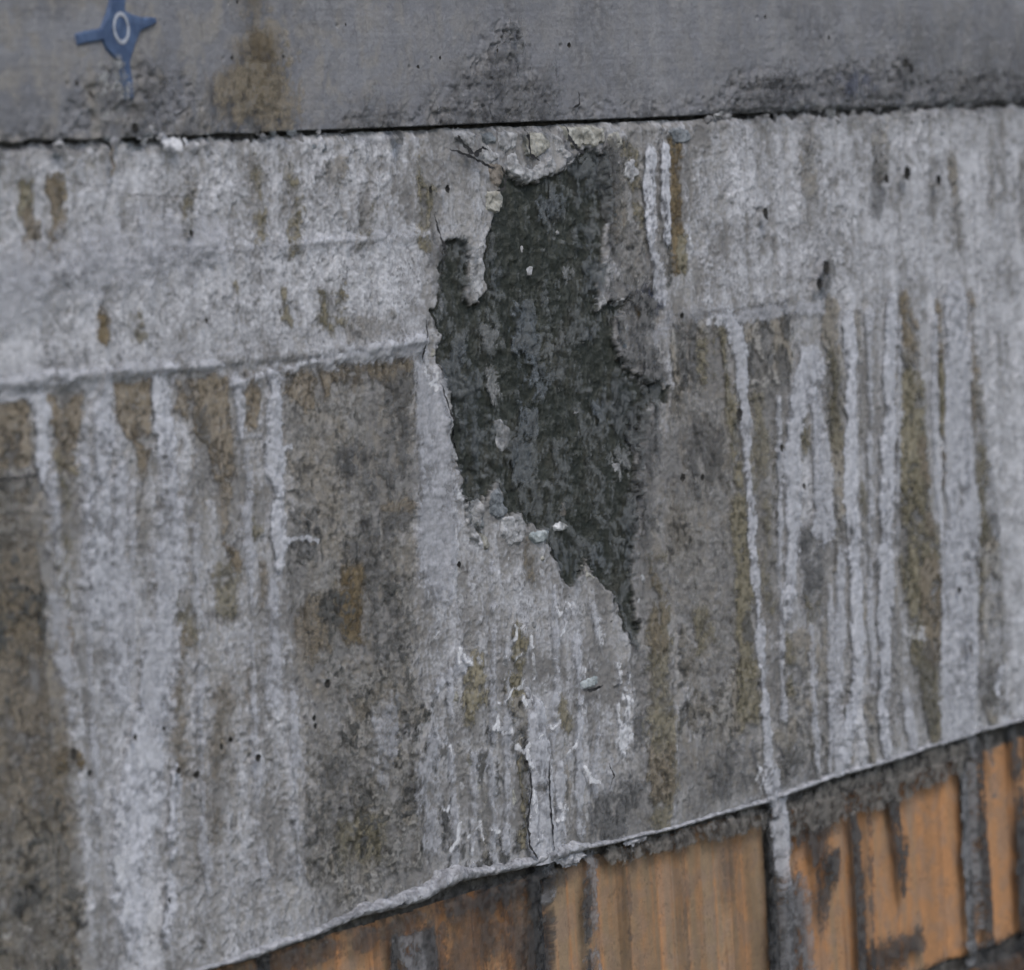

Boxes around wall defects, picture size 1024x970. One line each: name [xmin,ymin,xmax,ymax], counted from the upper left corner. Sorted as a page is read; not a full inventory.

damp [798,126,820,229]
damp [871,123,891,187]
damp [947,152,963,251]
spalling [424,93,675,647]
peeling [457,646,472,665]
damp [0,276,1024,970]
peeling [483,617,561,769]
peeling [450,810,501,865]
peeling [512,787,538,824]
crack [526,760,555,859]
peeling [553,796,590,822]
peeling [583,765,601,784]